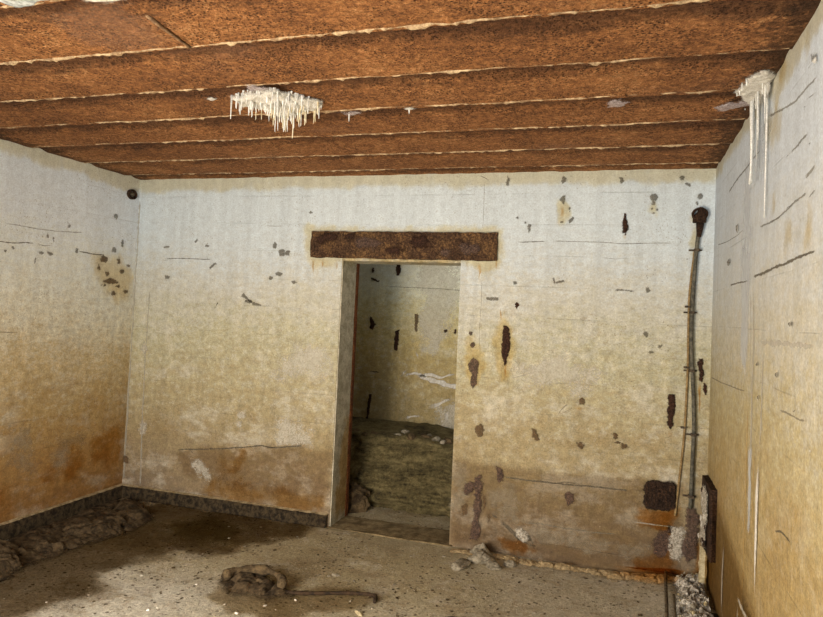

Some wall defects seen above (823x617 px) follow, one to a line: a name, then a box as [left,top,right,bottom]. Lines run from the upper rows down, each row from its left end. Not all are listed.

spalling [0,0,44,8]
rust [461,474,490,540]
rust [653,508,700,562]